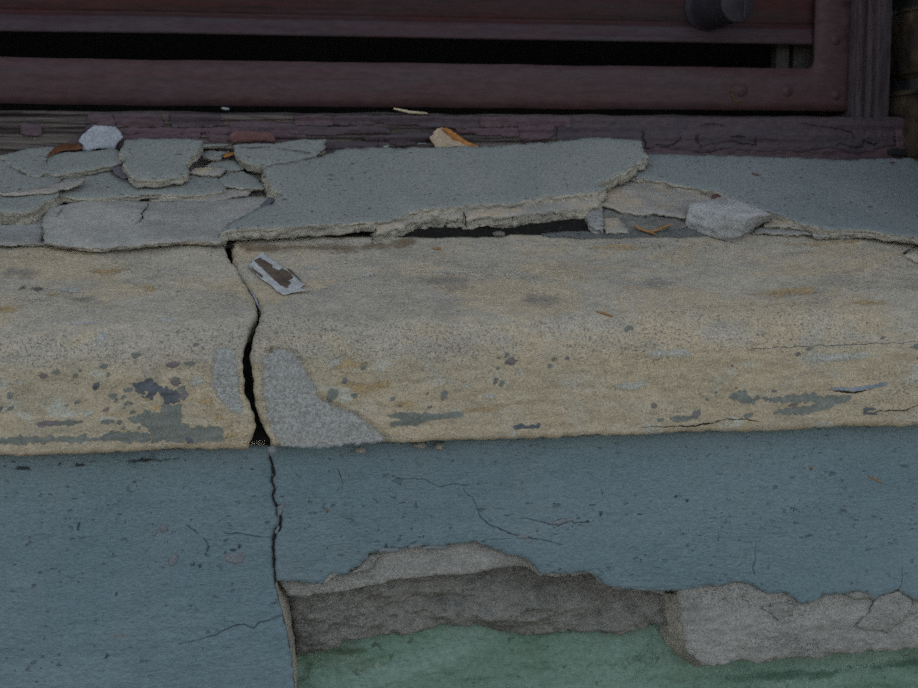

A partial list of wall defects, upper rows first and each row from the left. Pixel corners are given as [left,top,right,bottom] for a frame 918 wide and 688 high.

peeling [69,113,907,179]
spalling [603,217,629,235]
crack [225,241,236,264]
peeling [494,353,518,387]
peeling [0,361,224,446]
spalling [263,349,384,447]
peeling [387,396,464,427]
peeling [657,409,701,422]
peeling [729,382,888,418]
crack [187,320,286,583]
spalling [275,535,918,688]